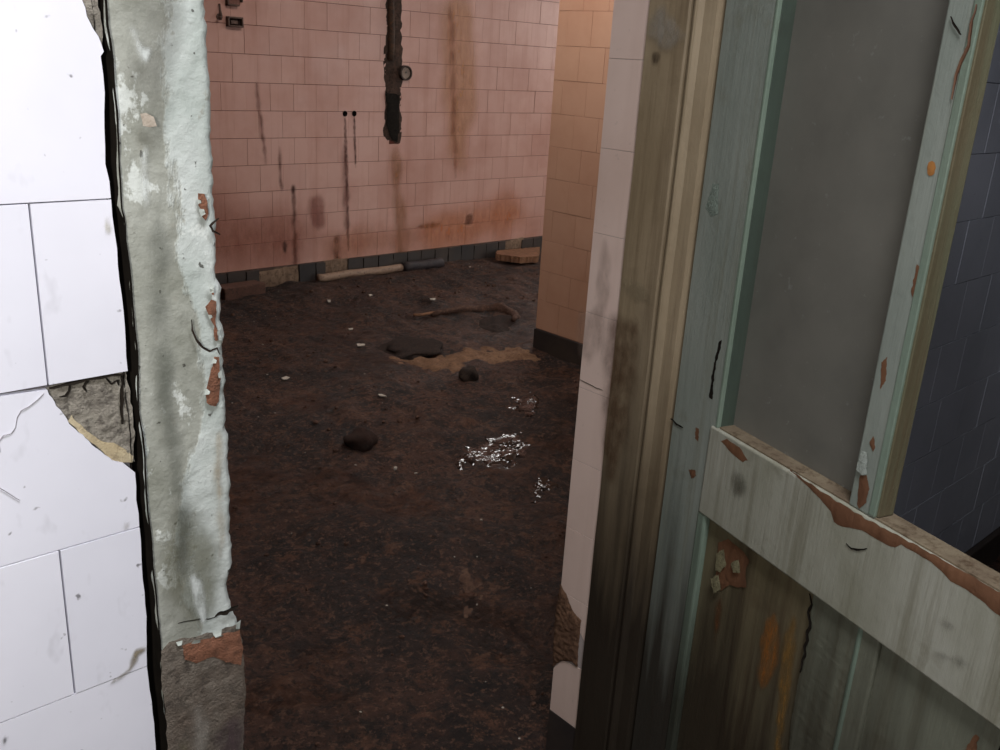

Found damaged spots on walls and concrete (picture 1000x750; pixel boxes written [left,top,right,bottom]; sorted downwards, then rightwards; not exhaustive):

peeling [198,193,211,221]
leakage [334,118,356,259]
peeling [205,283,222,344]
spalling [46,371,135,462]
crack [91,0,239,750]
peeling [204,357,223,406]
peeling [710,549,740,593]
peeling [790,437,1000,616]
crack [799,593,813,673]
spalling [161,620,246,750]